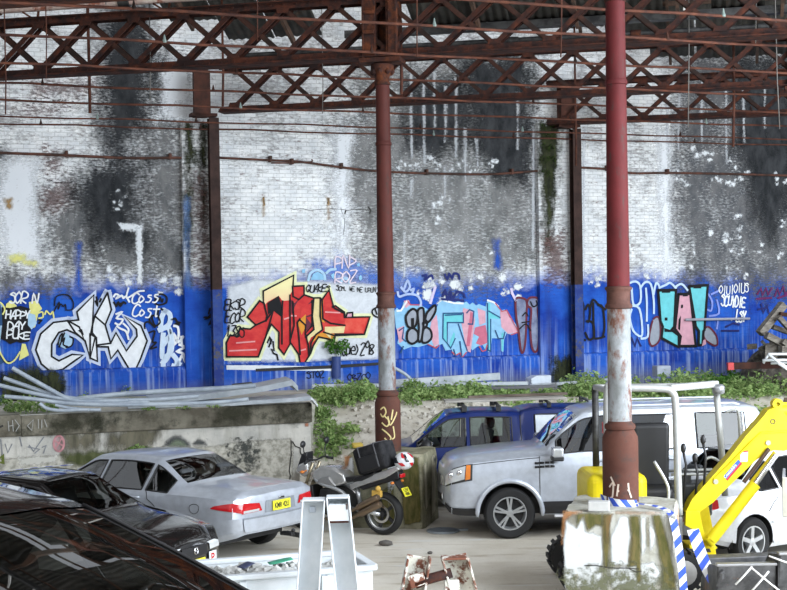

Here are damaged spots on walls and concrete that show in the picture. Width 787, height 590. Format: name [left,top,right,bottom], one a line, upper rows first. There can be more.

damp [90,20,187,65]
damp [0,72,183,300]
damp [340,68,377,272]
damp [389,56,548,299]
damp [660,55,787,303]
damp [604,514,613,543]
damp [663,515,678,586]